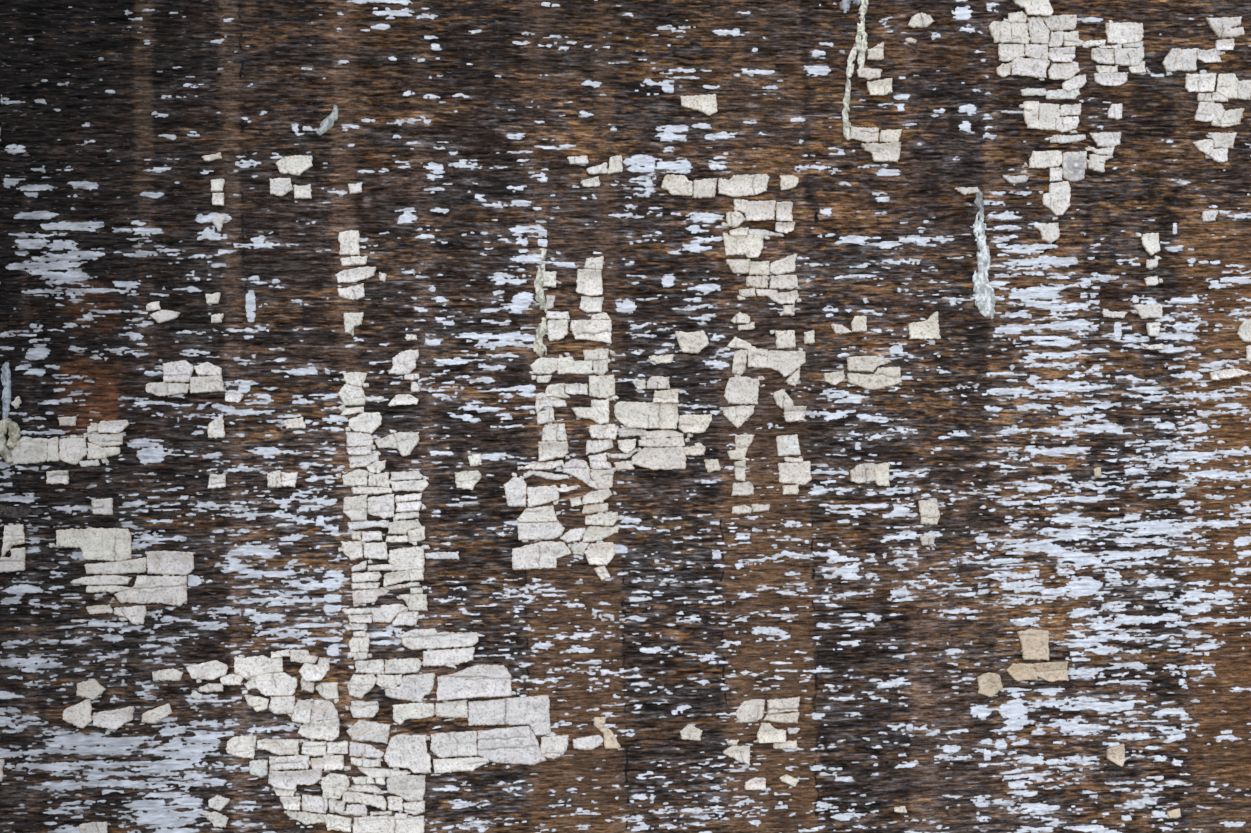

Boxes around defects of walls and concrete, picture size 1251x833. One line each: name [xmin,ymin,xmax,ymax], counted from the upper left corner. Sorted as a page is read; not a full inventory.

peeling [803,42,845,77]
peeling [853,12,941,111]
peeling [734,68,783,99]
peeling [958,104,997,140]
peeling [395,207,448,244]
peeling [316,230,401,300]
peeling [661,270,686,287]
peeling [332,312,390,352]
peeling [497,773,538,796]
peeling [447,799,493,809]